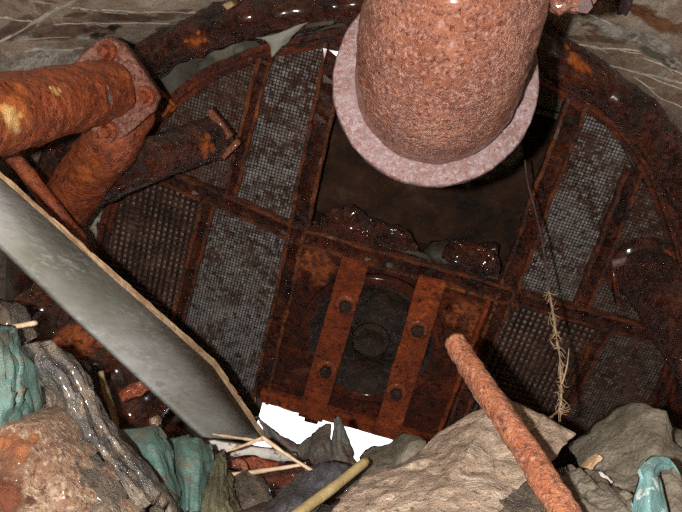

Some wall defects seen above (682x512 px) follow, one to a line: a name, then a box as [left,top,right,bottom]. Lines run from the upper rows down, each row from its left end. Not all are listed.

rust [184,30,207,48]
rust [563,44,592,73]
rust [195,133,215,159]
rust [0,81,95,252]
rust [311,204,419,252]
rust [297,249,337,287]
rust [441,239,501,278]
rust [444,297,486,339]